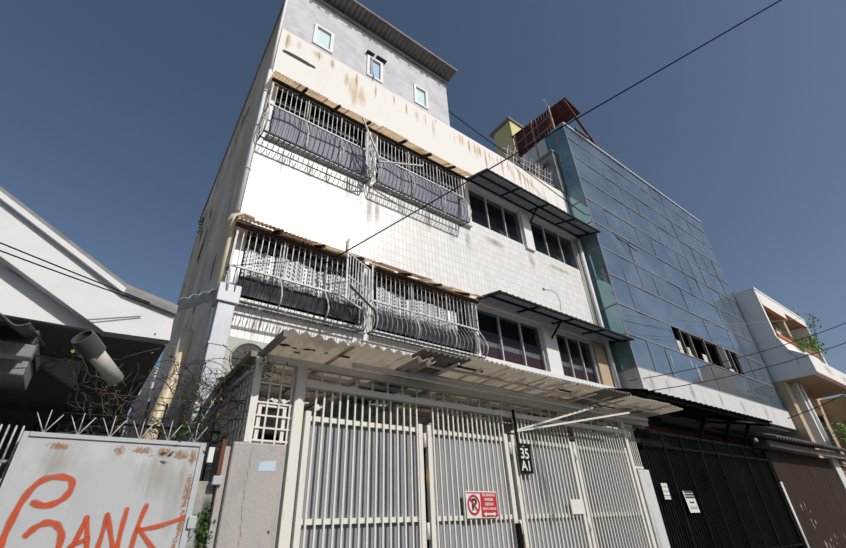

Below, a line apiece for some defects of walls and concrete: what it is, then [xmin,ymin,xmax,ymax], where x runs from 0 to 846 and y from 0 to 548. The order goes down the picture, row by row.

corrosion [159,448,196,463]
corrosion [172,474,192,548]